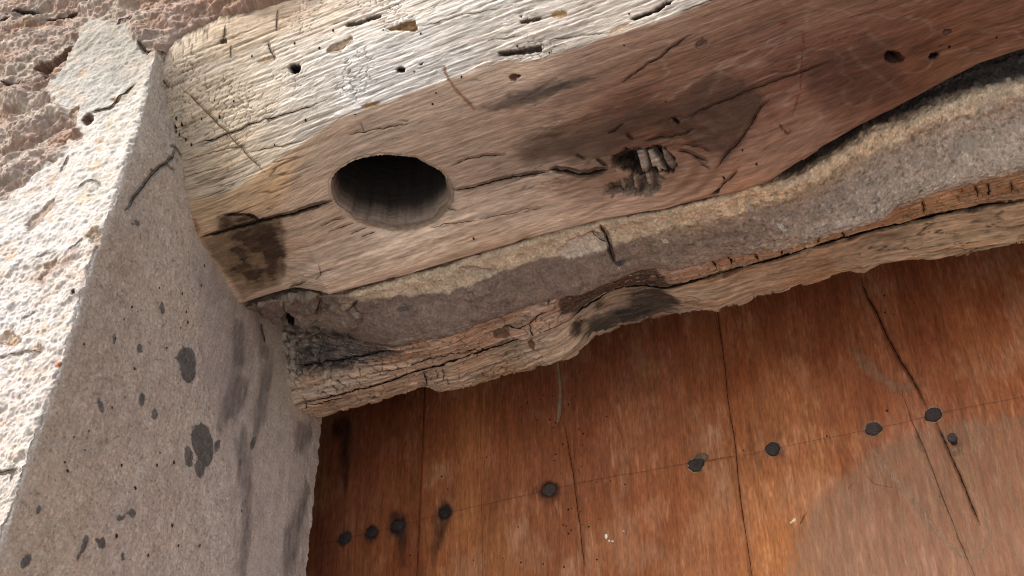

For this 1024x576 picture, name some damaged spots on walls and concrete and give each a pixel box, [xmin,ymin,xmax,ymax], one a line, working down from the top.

crack [92,86,132,112]
crack [127,80,327,209]
spalling [606,145,675,198]
water stain [207,220,285,293]
water stain [560,266,679,336]
water stain [175,346,196,383]
water stain [185,423,220,478]
water stain [239,376,271,569]